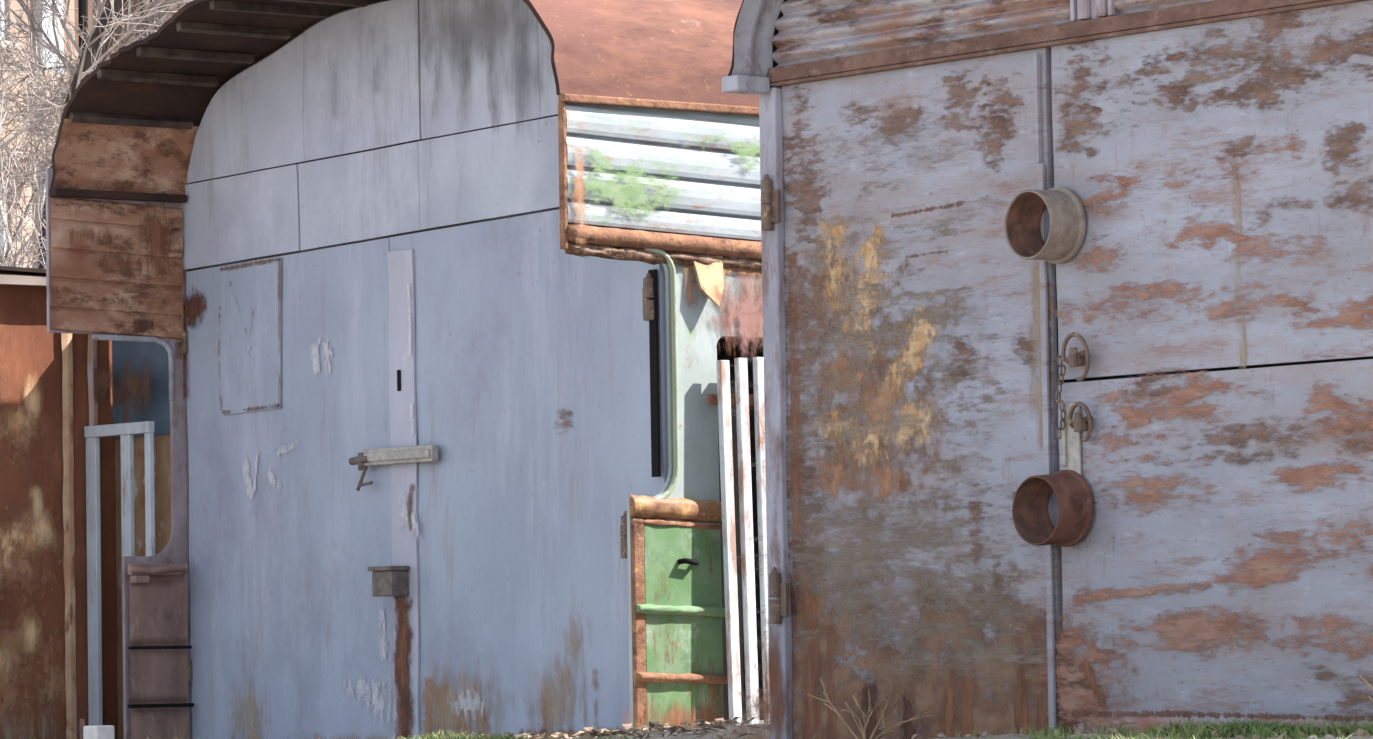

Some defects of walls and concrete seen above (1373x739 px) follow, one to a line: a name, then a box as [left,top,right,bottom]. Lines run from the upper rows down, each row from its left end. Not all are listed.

corrosion [806,0,870,27]
corrosion [599,74,1373,739]
corrosion [394,596,497,739]